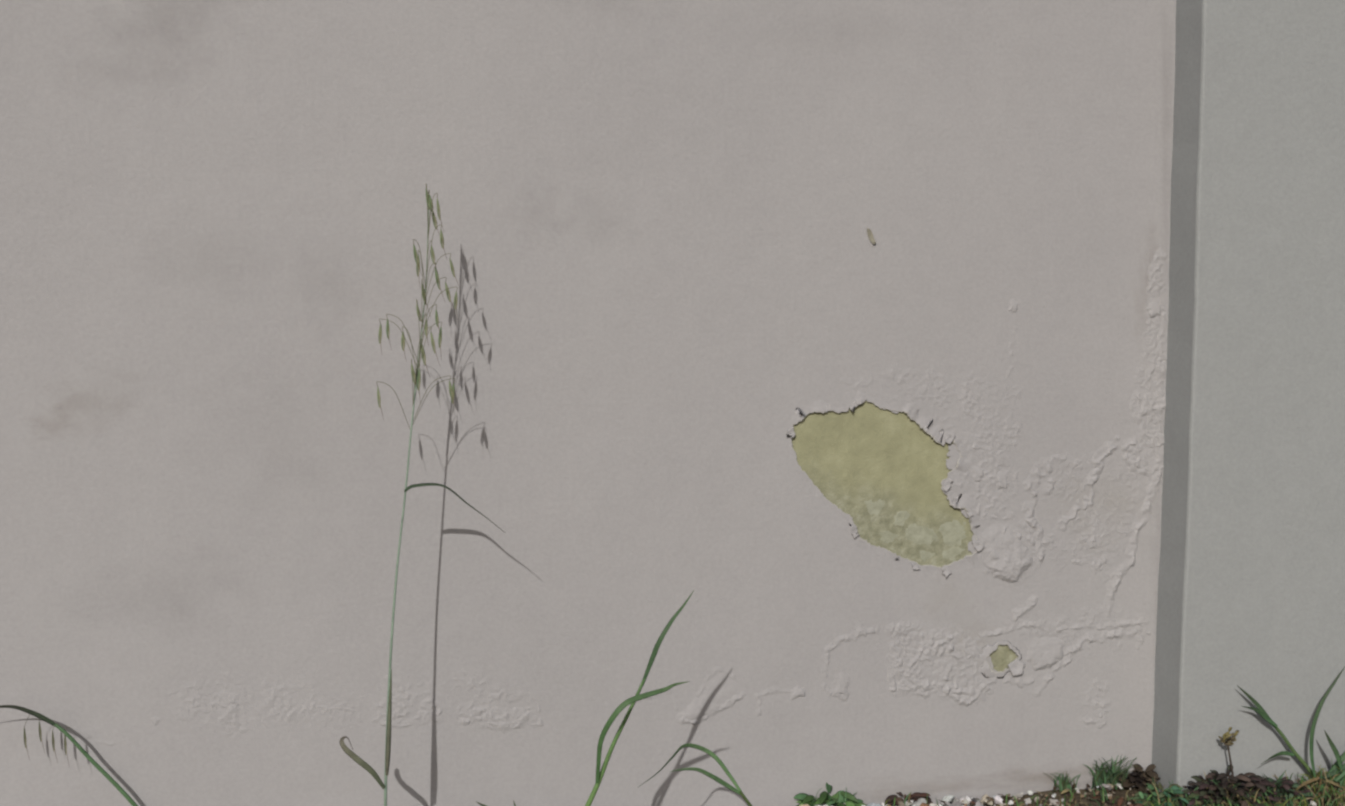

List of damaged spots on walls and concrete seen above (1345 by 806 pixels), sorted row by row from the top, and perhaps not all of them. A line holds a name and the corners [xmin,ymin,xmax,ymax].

peeling [786,390,984,578]
spalling [979,641,1025,679]